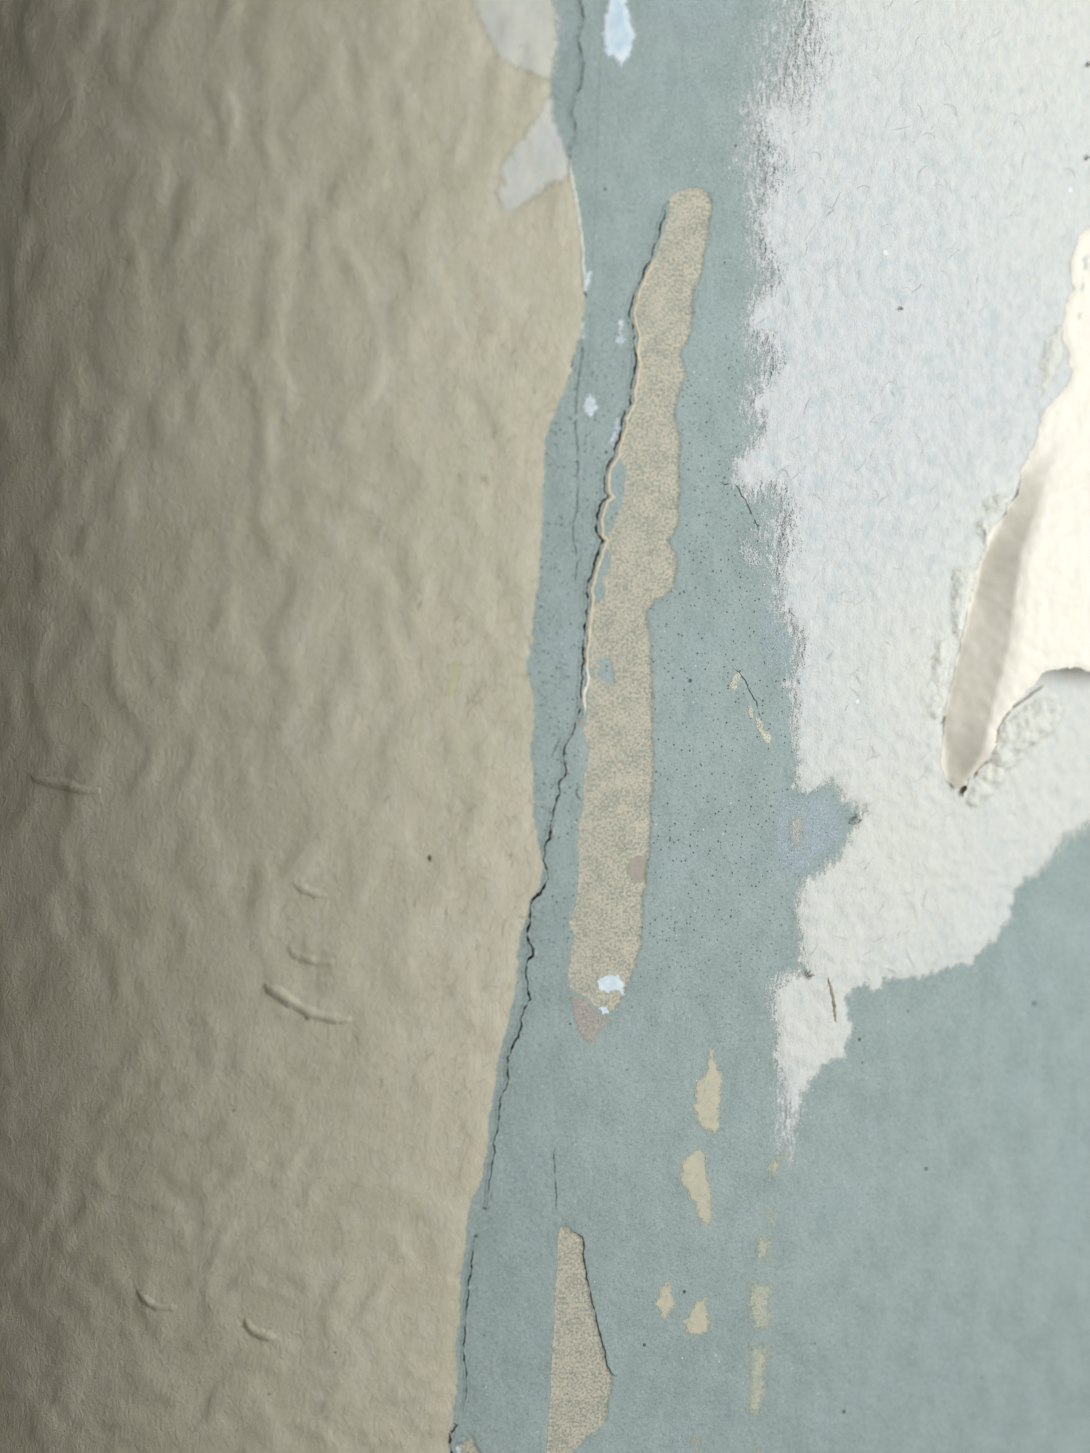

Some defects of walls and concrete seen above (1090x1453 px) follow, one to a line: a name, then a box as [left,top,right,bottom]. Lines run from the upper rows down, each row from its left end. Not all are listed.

spalling [568,186,712,1014]
crack [449,201,670,1453]
spalling [680,1048,723,1226]
spalling [547,1226,612,1453]
spalling [654,1281,711,1336]